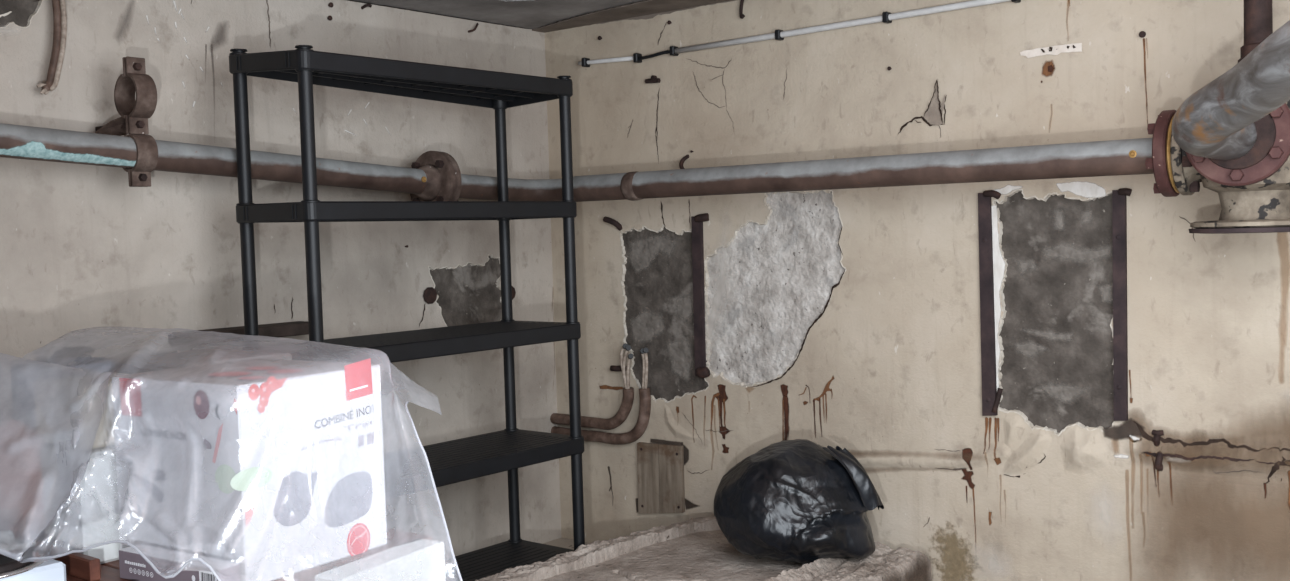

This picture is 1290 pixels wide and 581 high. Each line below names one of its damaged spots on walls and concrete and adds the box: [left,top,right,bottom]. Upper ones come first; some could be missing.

spalling [0,0,45,29]
corrosion [1041,61,1055,83]
peeling [898,80,947,135]
spalling [428,254,502,327]
spalling [619,190,846,403]
spalling [991,182,1116,436]
corrosion [676,384,730,453]
corrosion [781,376,834,441]
corrosion [961,417,1001,542]
crack [1133,421,1290,484]